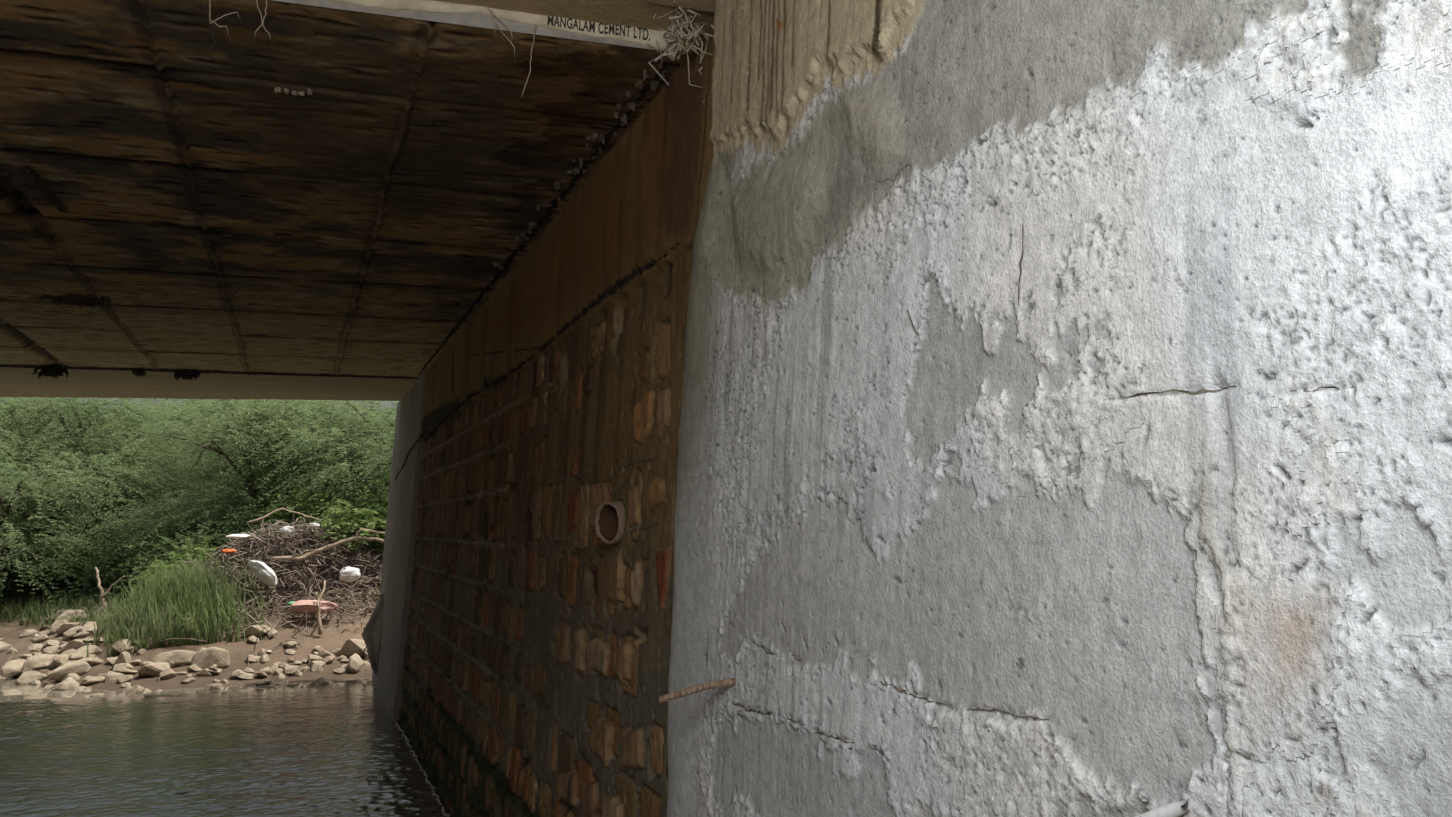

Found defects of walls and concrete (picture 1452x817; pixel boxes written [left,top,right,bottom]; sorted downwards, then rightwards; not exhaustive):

leakage [130,0,1400,361]
peeling [1271,366,1452,648]
crack [745,640,801,662]
crack [732,703,890,764]
crack [880,681,1049,720]
peeling [1319,663,1452,817]